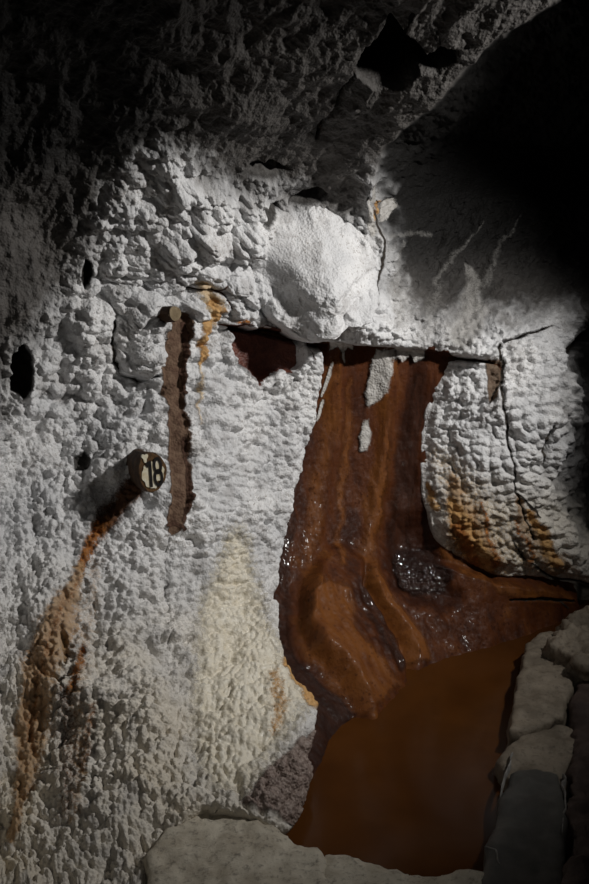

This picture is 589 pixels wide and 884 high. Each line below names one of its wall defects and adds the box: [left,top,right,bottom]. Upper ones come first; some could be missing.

corrosion [6,478,143,842]
corrosion [195,281,227,420]
spalling [220,324,313,394]
crack [368,197,386,291]
corrosion [273,342,580,776]
crack [455,325,589,609]